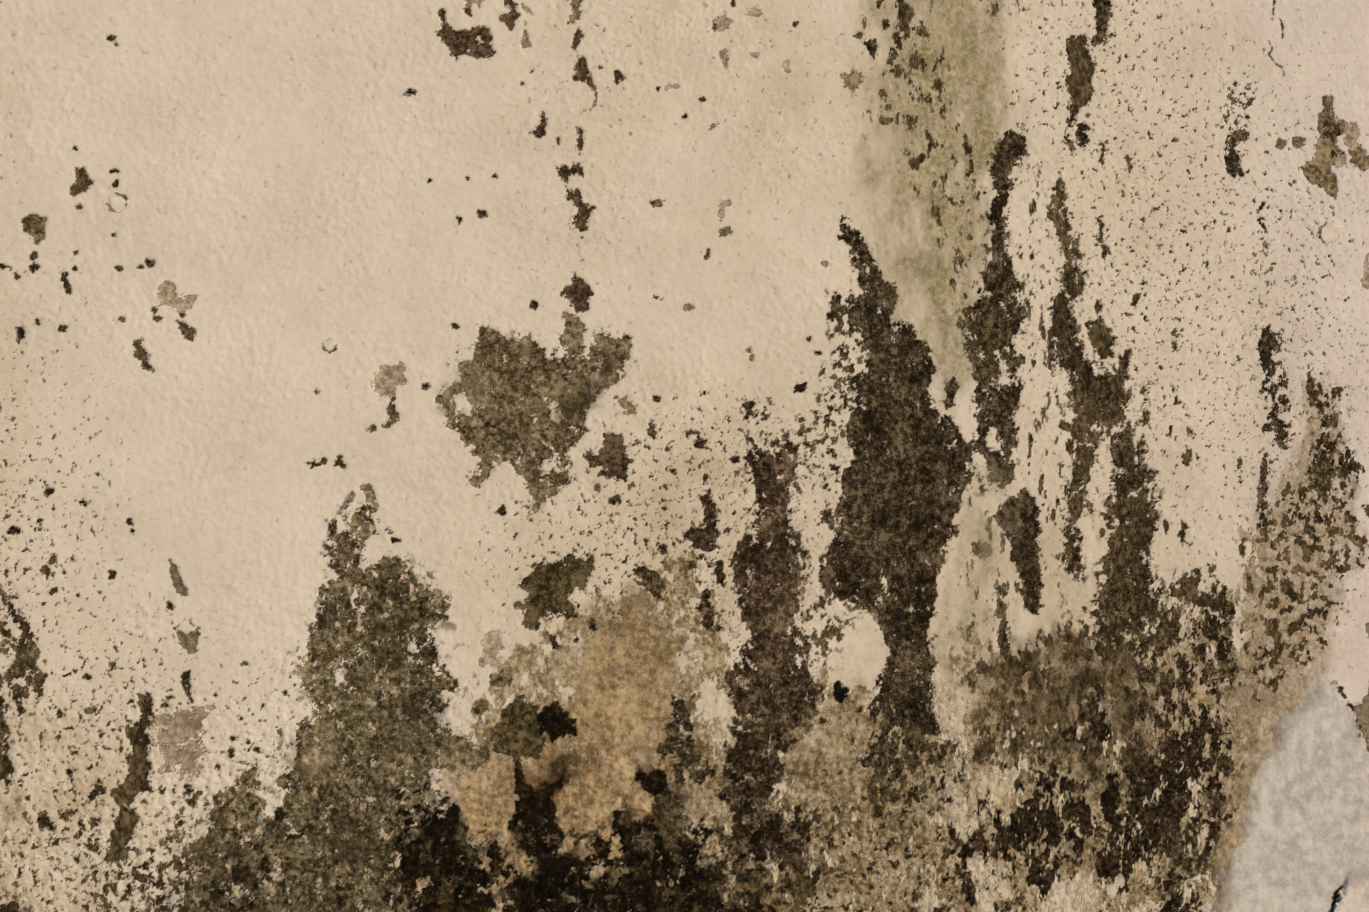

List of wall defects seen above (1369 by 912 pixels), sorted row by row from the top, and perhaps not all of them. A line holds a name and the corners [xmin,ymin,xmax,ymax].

peeling [437,0,532,60]
peeling [567,0,625,107]
peeling [529,111,596,239]
peeling [1275,95,1369,200]
peeling [456,209,488,225]
peeling [704,200,733,260]
peeling [366,272,670,515]
peeling [686,429,707,449]
water stain [380,0,1369,912]
peeling [1333,681,1369,751]
peeling [1331,875,1369,912]